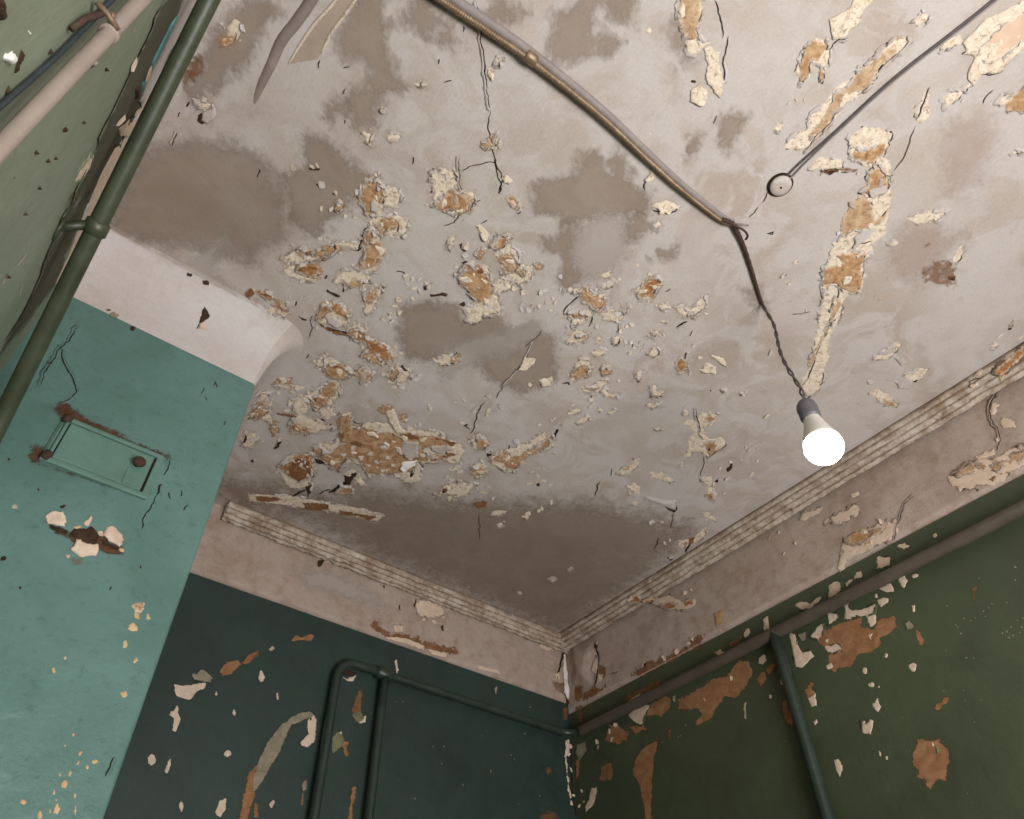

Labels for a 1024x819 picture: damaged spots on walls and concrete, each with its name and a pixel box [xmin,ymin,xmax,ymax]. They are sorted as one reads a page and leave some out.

crack [444,0,507,226]
water stain [109,137,376,264]
spalling [773,0,933,408]
rust [28,446,45,462]
crack [35,325,80,404]
rust [55,403,170,459]
spalling [239,163,709,539]
water stain [395,301,557,391]
crack [986,393,1001,450]
spalling [45,505,124,558]
water stain [225,483,685,629]
peeling [788,574,925,735]